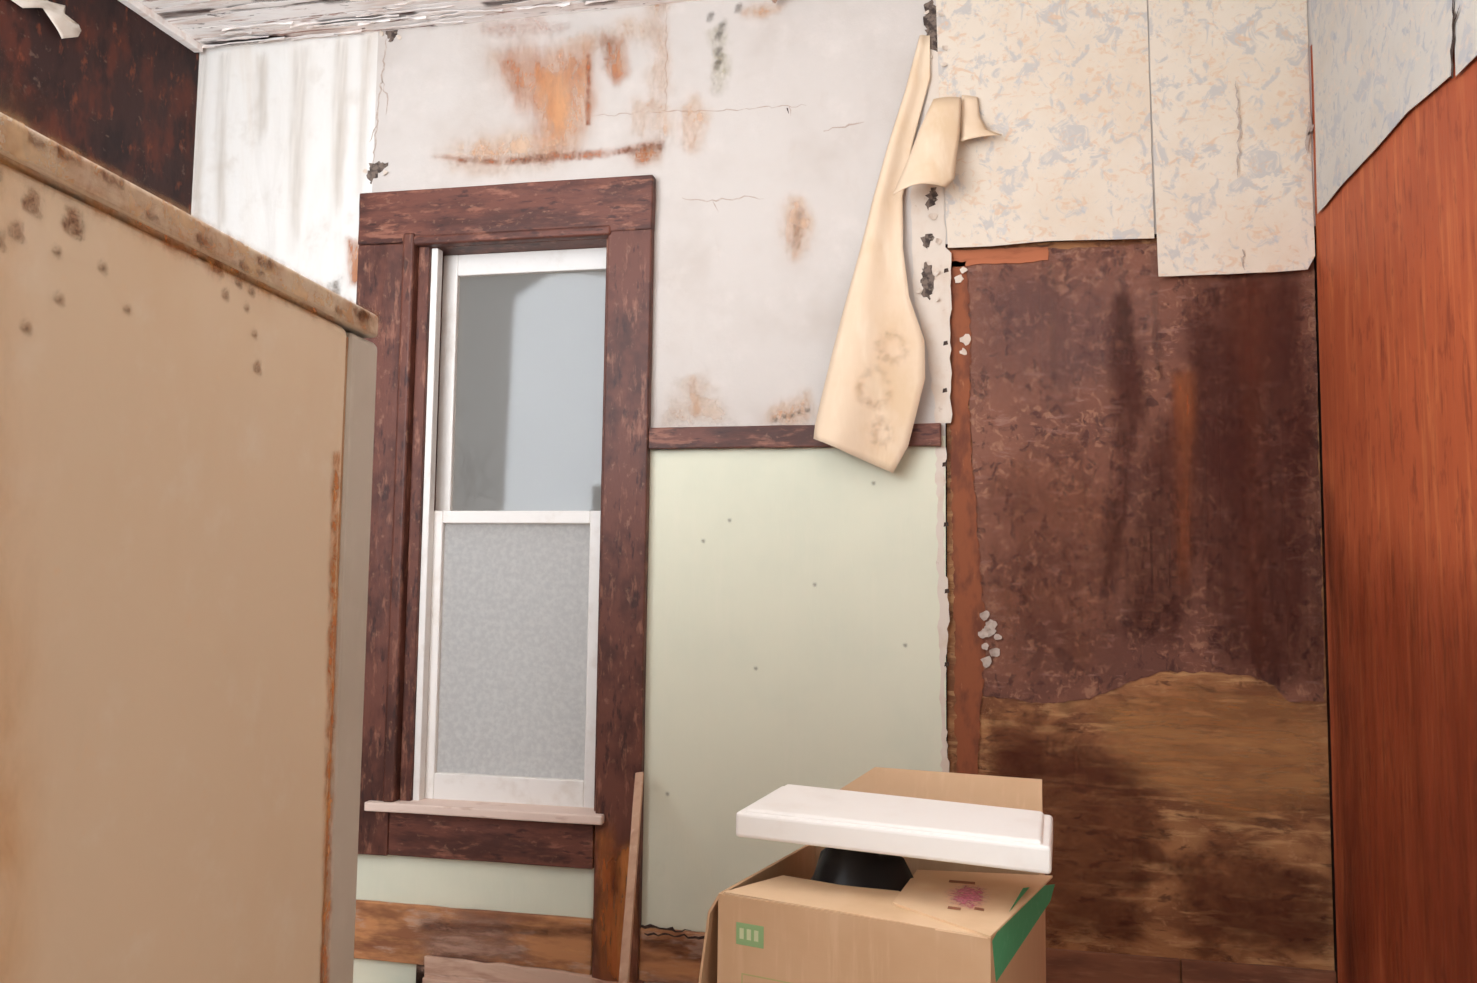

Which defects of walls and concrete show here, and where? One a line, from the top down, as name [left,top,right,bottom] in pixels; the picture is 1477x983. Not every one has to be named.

peeling [159,0,614,48]
crack [1450,0,1460,78]
flaking render [915,187,968,302]
peeling [943,334,971,355]
corrosion [325,457,339,877]
peeling [978,611,1002,668]
water stain [993,688,1328,951]
corrosion [322,900,331,983]